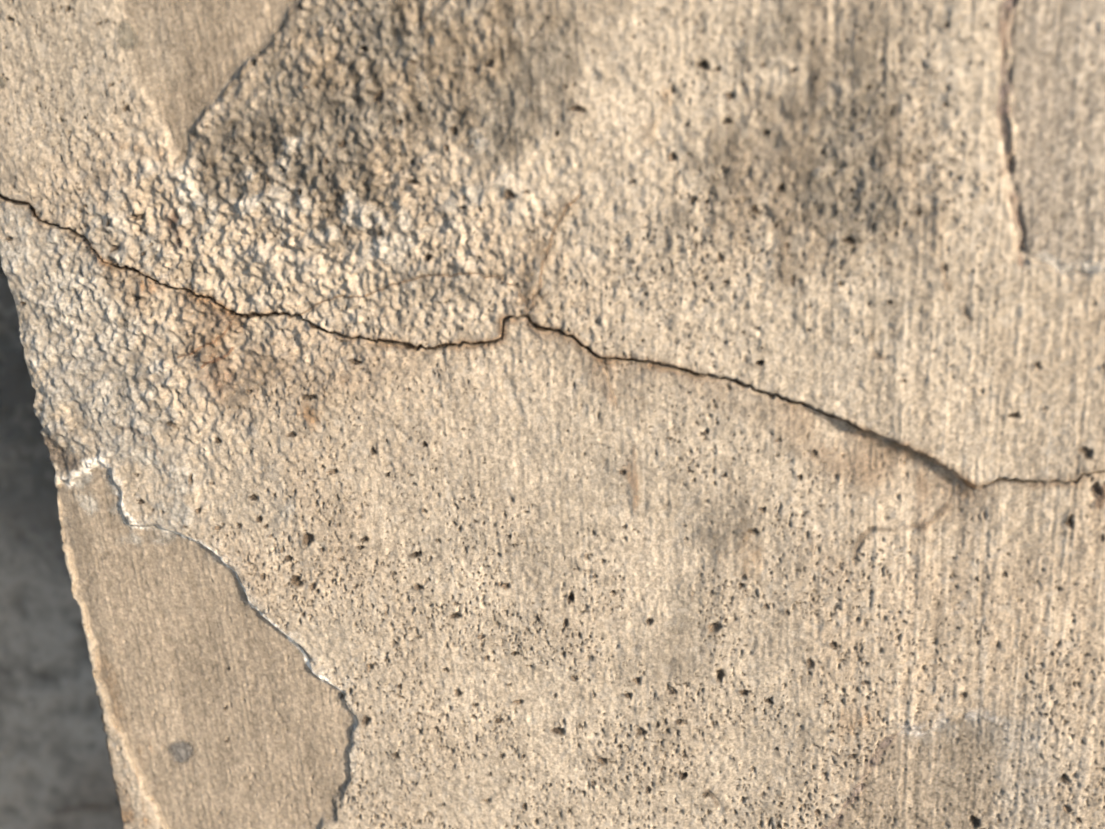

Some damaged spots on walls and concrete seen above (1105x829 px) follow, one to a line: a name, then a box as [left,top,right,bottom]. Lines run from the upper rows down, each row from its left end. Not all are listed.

crack [0,187,645,368]
crack [678,368,1032,530]
crack [1078,471,1105,508]
spalling [43,437,371,829]